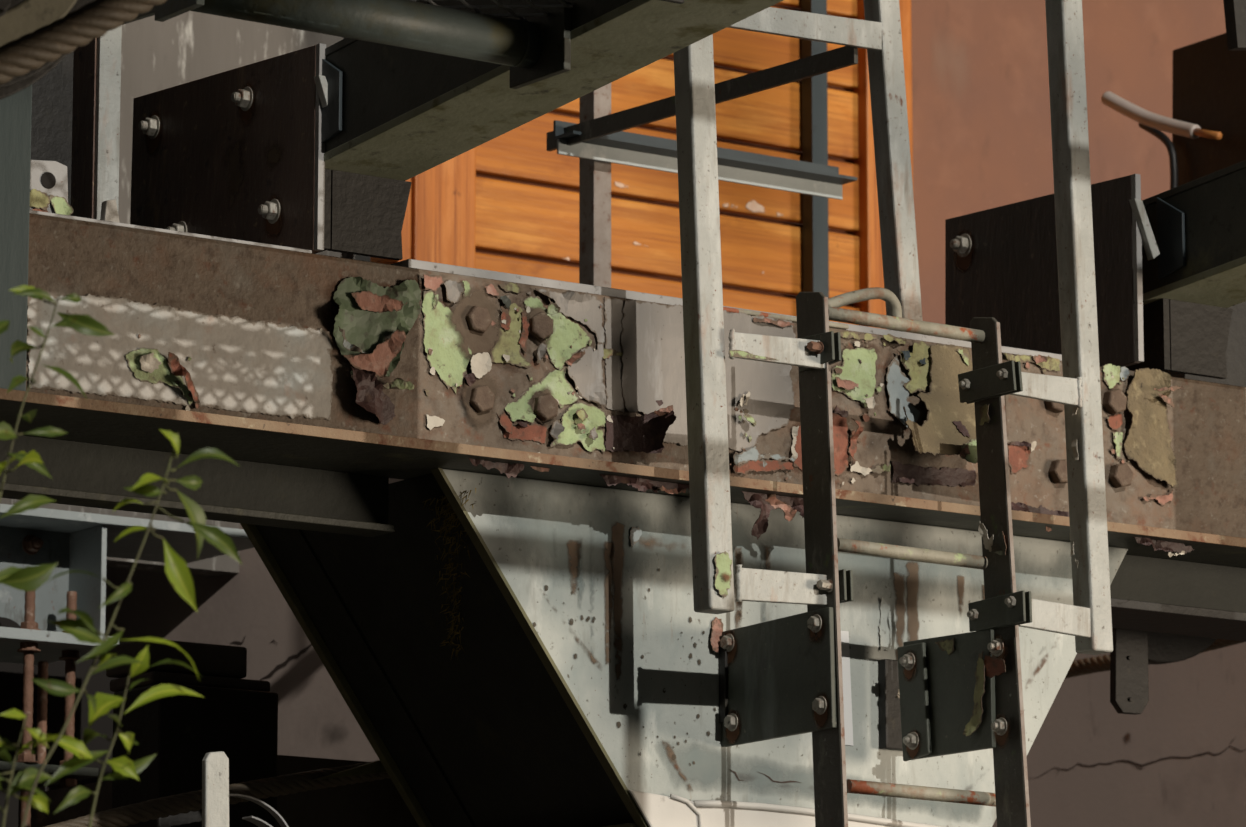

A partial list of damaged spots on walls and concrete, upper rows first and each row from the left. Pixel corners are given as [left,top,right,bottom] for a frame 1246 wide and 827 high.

peeling [27,274,688,472]
peeling [723,310,802,480]
peeling [829,329,932,485]
peeling [1004,353,1060,374]
peeling [1102,364,1130,390]
peeling [1107,413,1130,463]
peeling [741,491,804,540]
peeling [978,523,1007,556]
peeling [1011,502,1069,532]
corrosion [663,742,691,788]
crack [1028,737,1246,778]